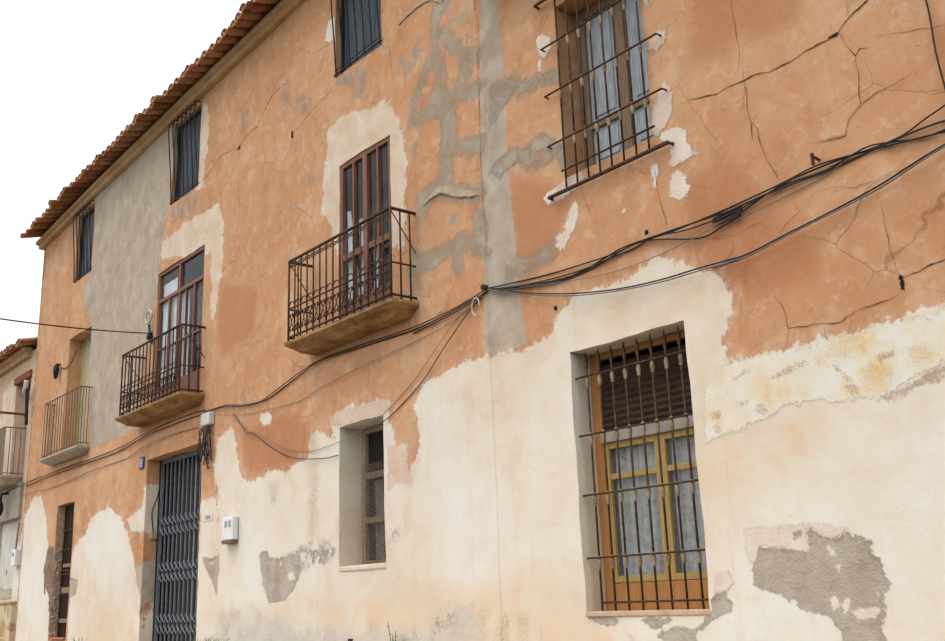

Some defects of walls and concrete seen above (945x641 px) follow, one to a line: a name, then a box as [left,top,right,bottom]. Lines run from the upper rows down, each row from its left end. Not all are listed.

flaking render [535,34,551,73]
flaking render [646,28,667,52]
crack [659,0,945,179]
flaking render [651,80,700,201]
crack [775,206,945,345]
flaking render [701,306,945,443]
flaking render [127,510,144,532]
flaking render [43,547,54,640]
flaking render [203,553,220,595]
flaking render [259,550,302,604]
flaking render [641,570,734,641]
flaking render [743,522,892,641]